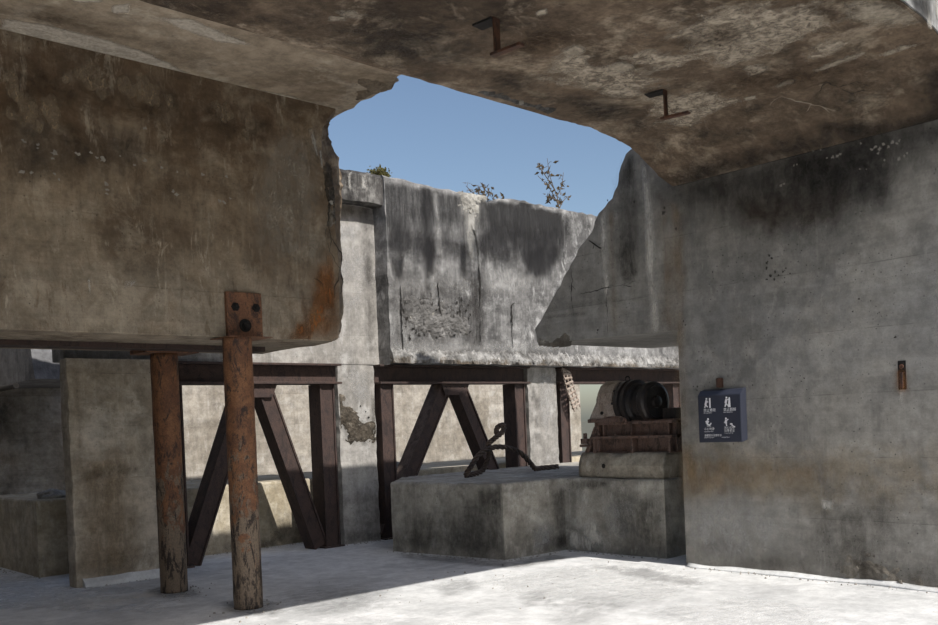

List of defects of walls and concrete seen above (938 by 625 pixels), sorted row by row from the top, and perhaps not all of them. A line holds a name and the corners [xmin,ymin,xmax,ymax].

crack [314,210,343,297]
damp [389,189,558,288]
spalling [339,394,376,445]